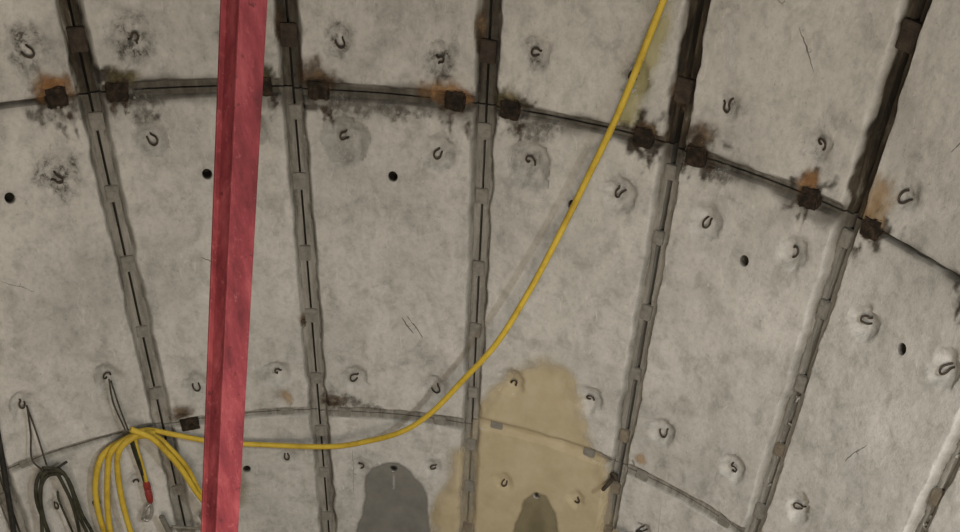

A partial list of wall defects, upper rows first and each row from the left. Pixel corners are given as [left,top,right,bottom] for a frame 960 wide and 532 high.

rust [37,75,70,100]
rust [690,124,711,146]
rust [863,181,887,226]
rust [322,395,346,406]
water stain [473,364,608,532]
water stain [357,450,464,532]